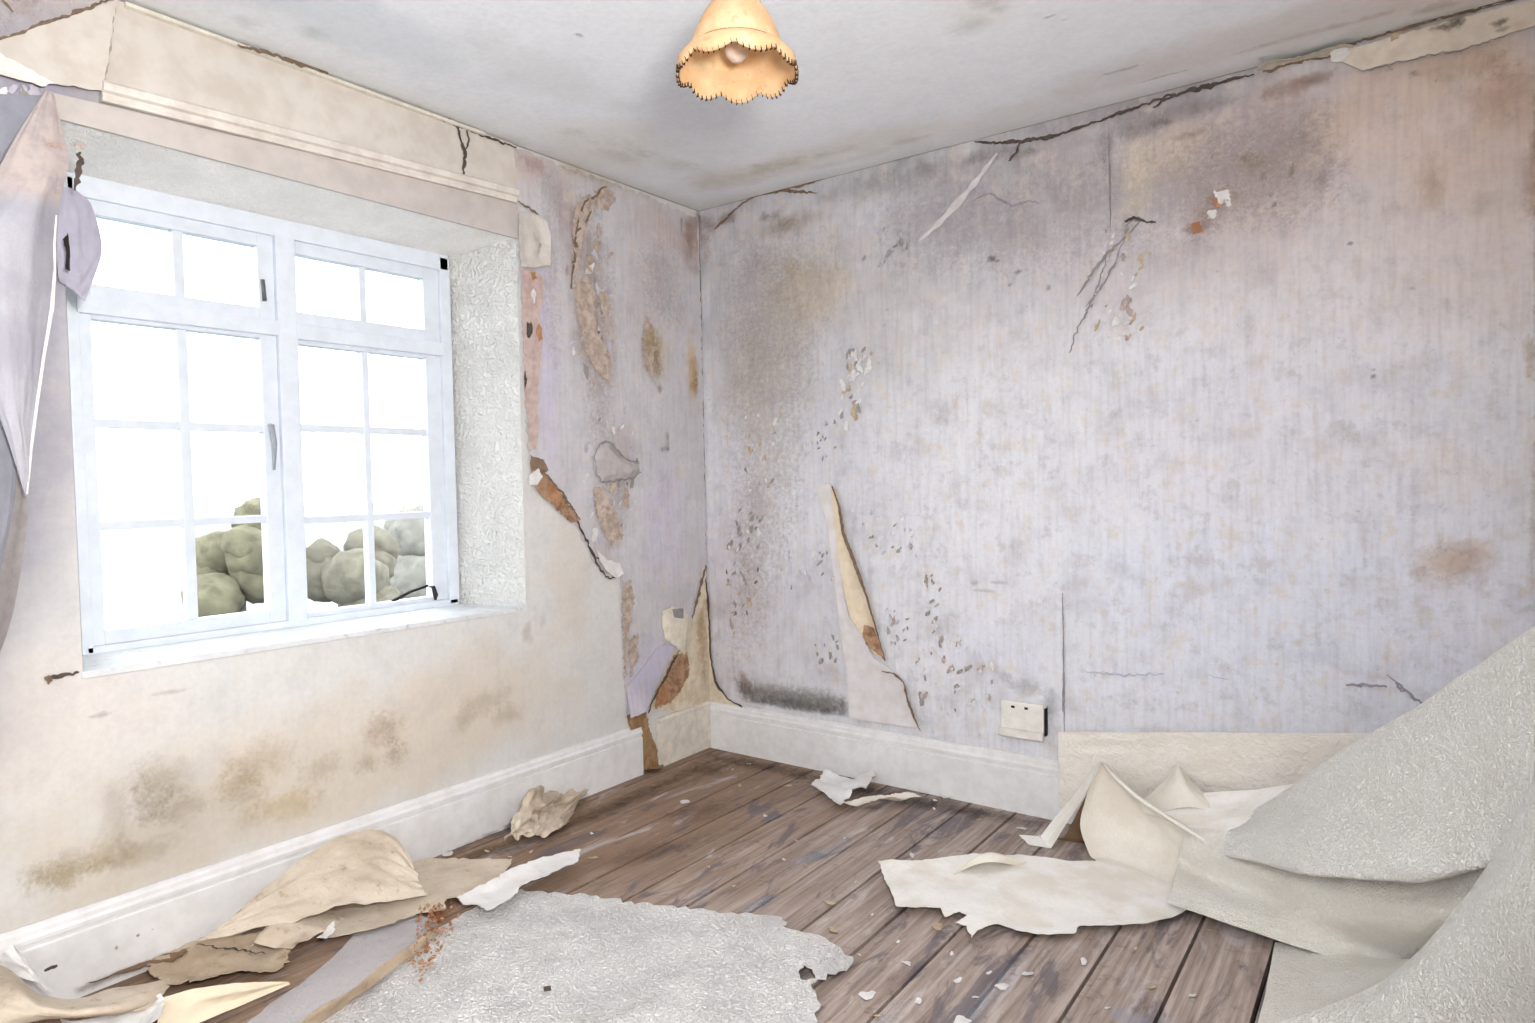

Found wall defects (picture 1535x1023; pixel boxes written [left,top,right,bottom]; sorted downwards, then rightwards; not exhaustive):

peeling [1257,0,1535,71]
peeling [0,84,40,95]
crack [443,118,517,174]
crack [919,0,1513,353]
spalling [518,185,639,680]
peeling [744,406,783,491]
peeling [726,508,766,635]
peeling [851,508,926,558]
spalling [627,564,742,772]